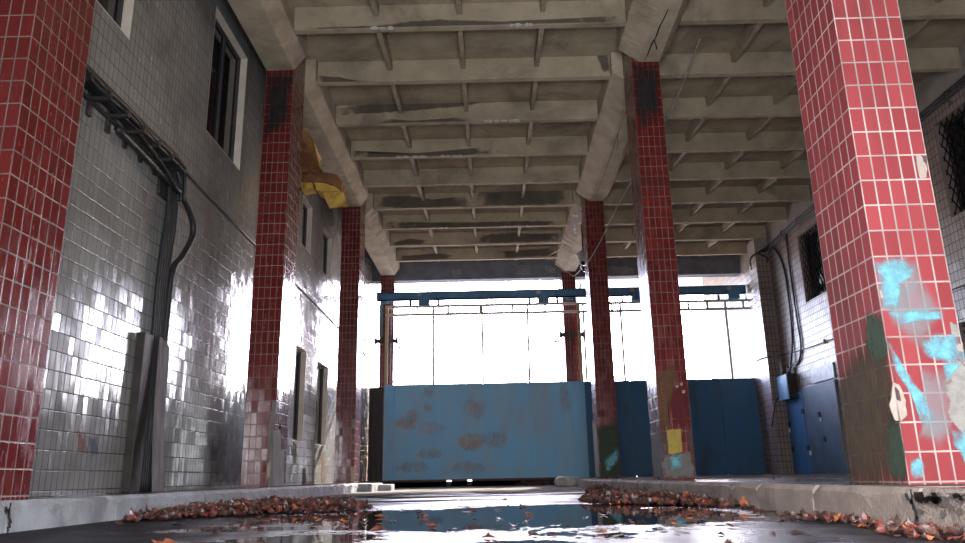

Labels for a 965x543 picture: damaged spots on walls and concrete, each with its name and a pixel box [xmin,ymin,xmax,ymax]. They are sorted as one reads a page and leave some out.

peeling [950,322,964,352]
spalling [889,382,907,421]